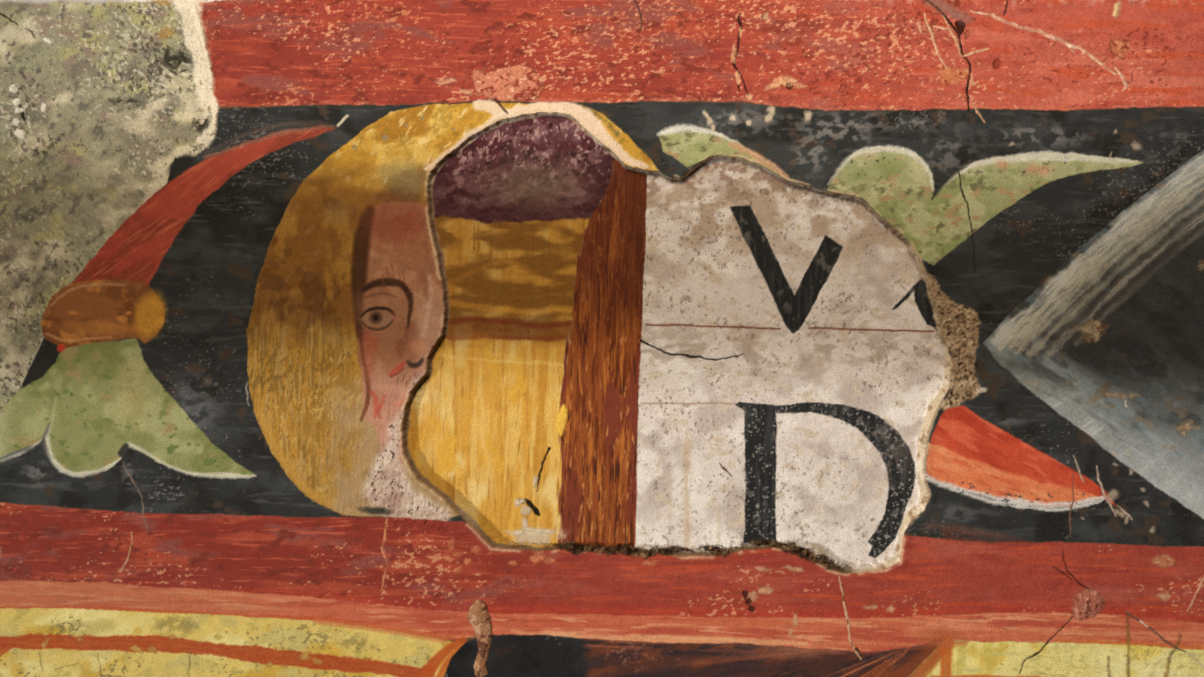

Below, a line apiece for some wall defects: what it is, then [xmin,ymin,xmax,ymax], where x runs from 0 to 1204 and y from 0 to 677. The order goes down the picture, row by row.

crack [926,0,971,111]
flaking render [0,0,209,415]
spalling [401,112,985,574]
peeling [1081,320,1103,342]
crack [1054,483,1092,591]
peeling [743,587,772,612]
crack [1019,617,1073,674]
crack [1126,612,1204,668]